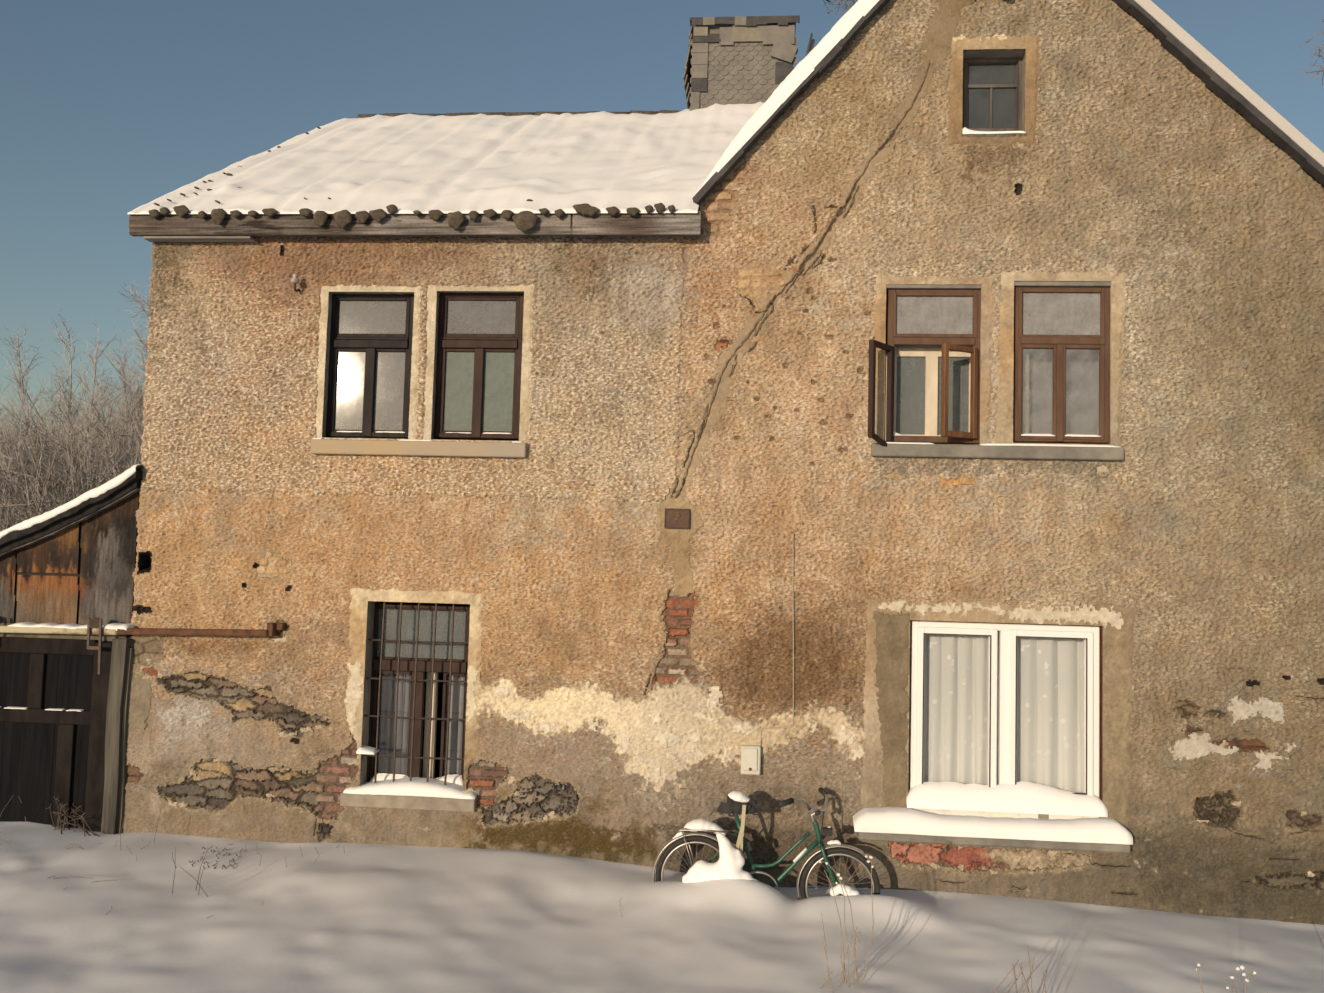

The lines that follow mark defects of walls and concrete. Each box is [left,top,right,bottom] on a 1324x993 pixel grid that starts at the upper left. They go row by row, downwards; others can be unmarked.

crack [666,0,962,498]
peeling [878,600,1125,629]
flaking render [126,765,144,783]
flaking render [129,636,365,843]
flaking render [463,757,580,828]
flaking render [466,584,866,812]
leakage [722,620,860,705]
flaking render [1164,688,1302,829]
flaking render [1276,809,1322,834]
flaking render [886,842,1091,897]